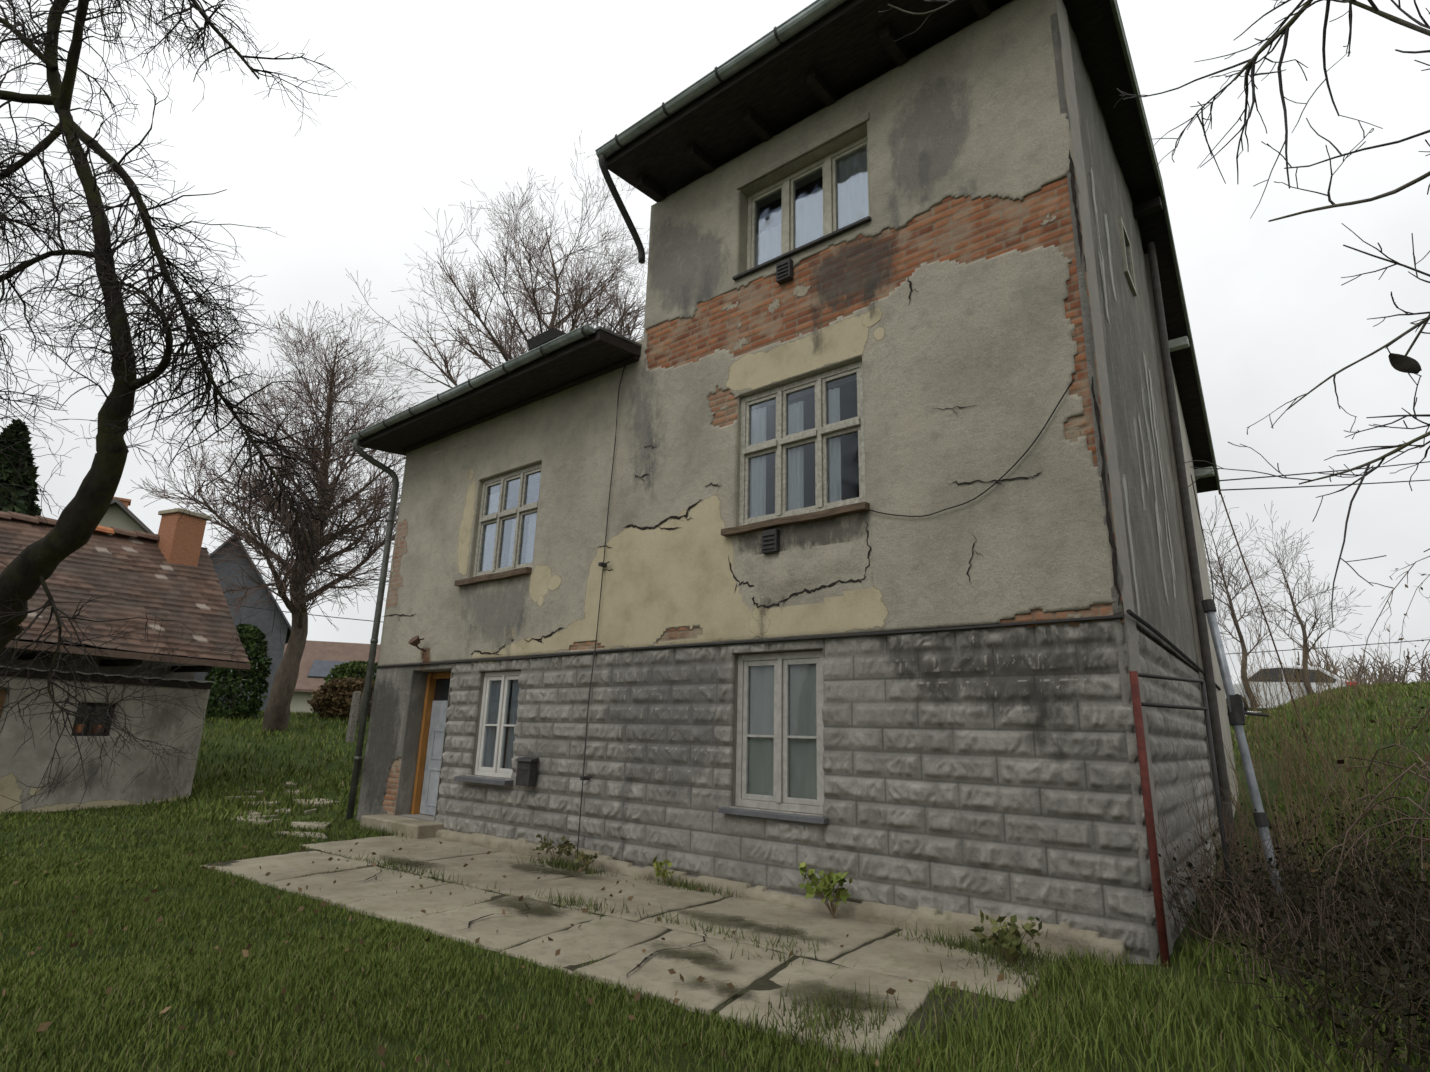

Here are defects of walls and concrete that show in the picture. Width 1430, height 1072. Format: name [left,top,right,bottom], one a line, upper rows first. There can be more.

spalling [645,168,1118,555]
crack [598,483,722,571]
crack [728,522,872,608]
crack [470,627,562,655]